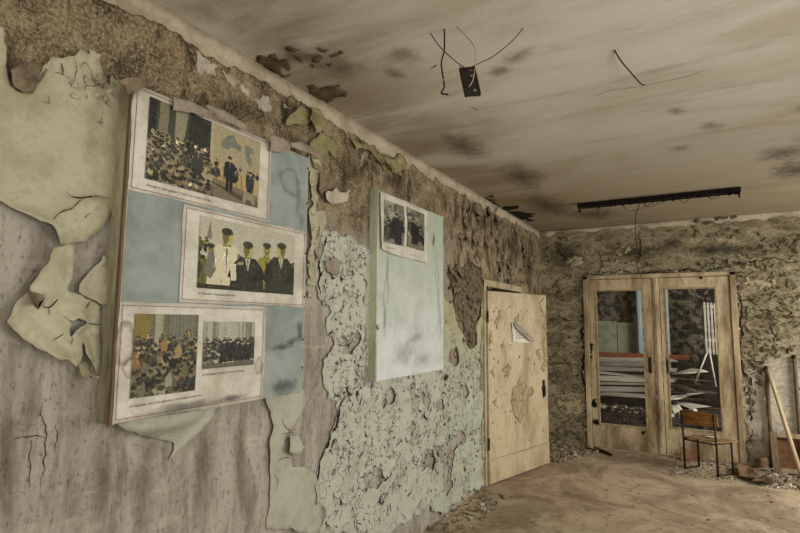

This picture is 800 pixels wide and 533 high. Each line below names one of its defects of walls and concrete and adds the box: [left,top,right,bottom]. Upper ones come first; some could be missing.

crack [56,58,100,91]
peeling [255,46,344,78]
peeling [307,85,348,103]
peeling [0,26,123,380]
crack [53,193,110,235]
peeling [265,131,585,533]
crack [12,408,58,488]